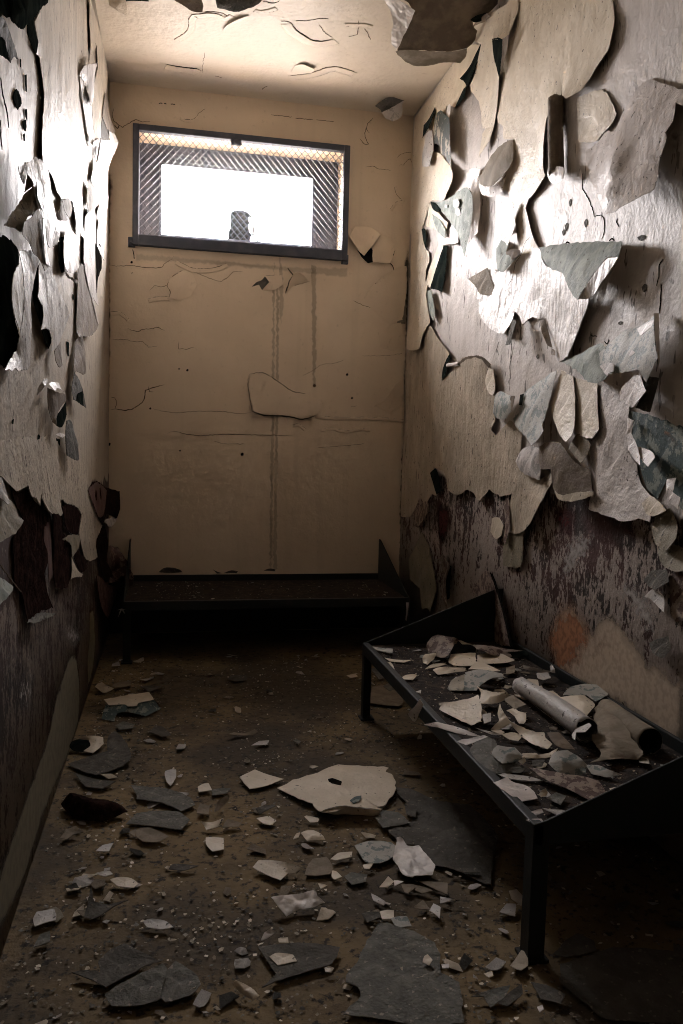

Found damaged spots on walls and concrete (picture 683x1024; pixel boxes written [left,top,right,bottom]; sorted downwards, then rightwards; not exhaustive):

peeling [175,0,203,12]
peeling [216,0,262,12]
crack [174,1,373,90]
crack [112,249,242,282]
peeling [350,0,683,622]
crack [112,385,404,448]
peeling [0,0,161,924]
water stain [556,511,594,579]